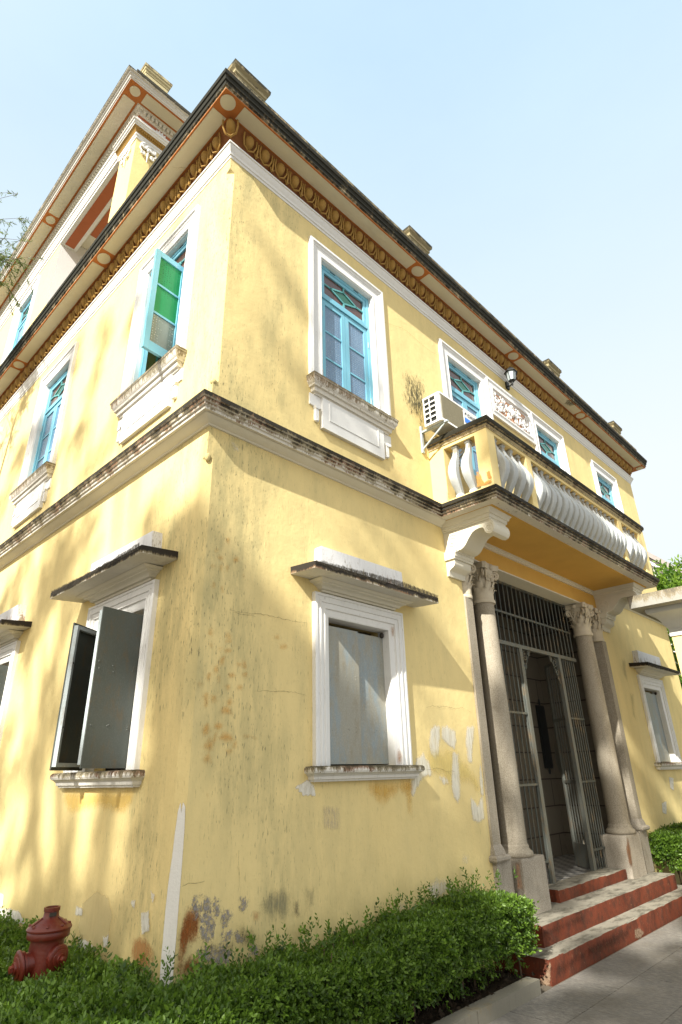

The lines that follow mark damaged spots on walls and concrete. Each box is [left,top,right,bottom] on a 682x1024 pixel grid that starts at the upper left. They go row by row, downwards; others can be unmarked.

leakage [405,377,424,413]
peeling [411,725,484,821]
rust [180,911,198,970]
spalling [192,897,258,965]